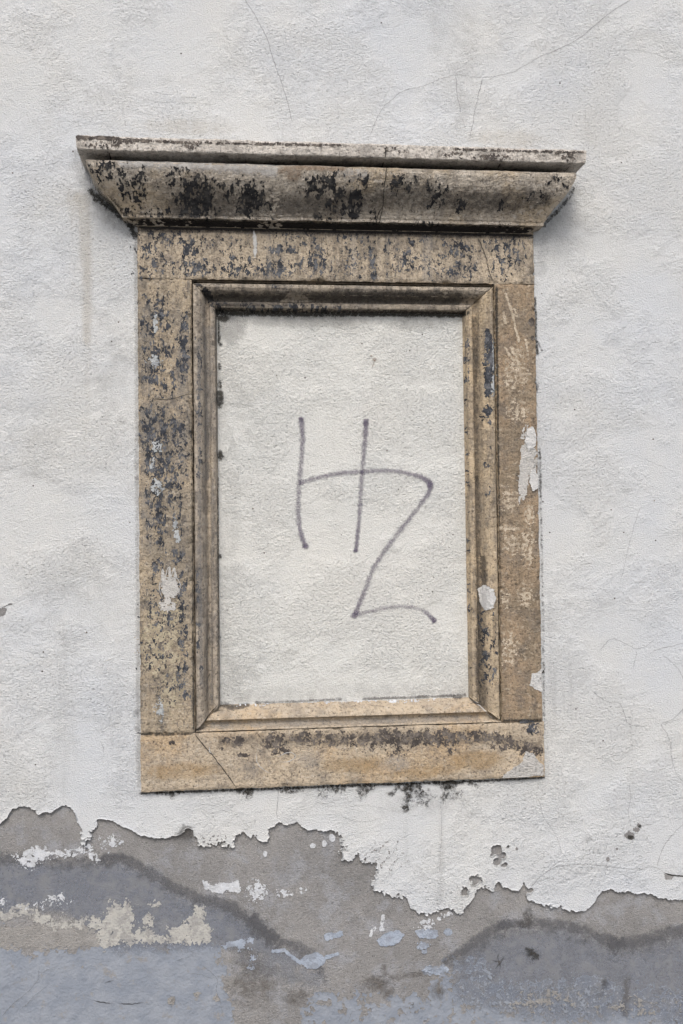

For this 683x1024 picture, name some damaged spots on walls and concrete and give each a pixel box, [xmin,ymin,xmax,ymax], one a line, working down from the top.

leakage [89,189,138,239]
peeling [72,141,530,724]
leakage [140,777,545,812]
peeling [11,833,124,871]
peeling [0,892,258,970]
leakage [94,854,310,958]
peeling [202,878,307,903]
peeling [271,948,339,969]
peeling [369,911,453,975]
leakage [444,912,682,963]
peeling [456,967,683,1021]